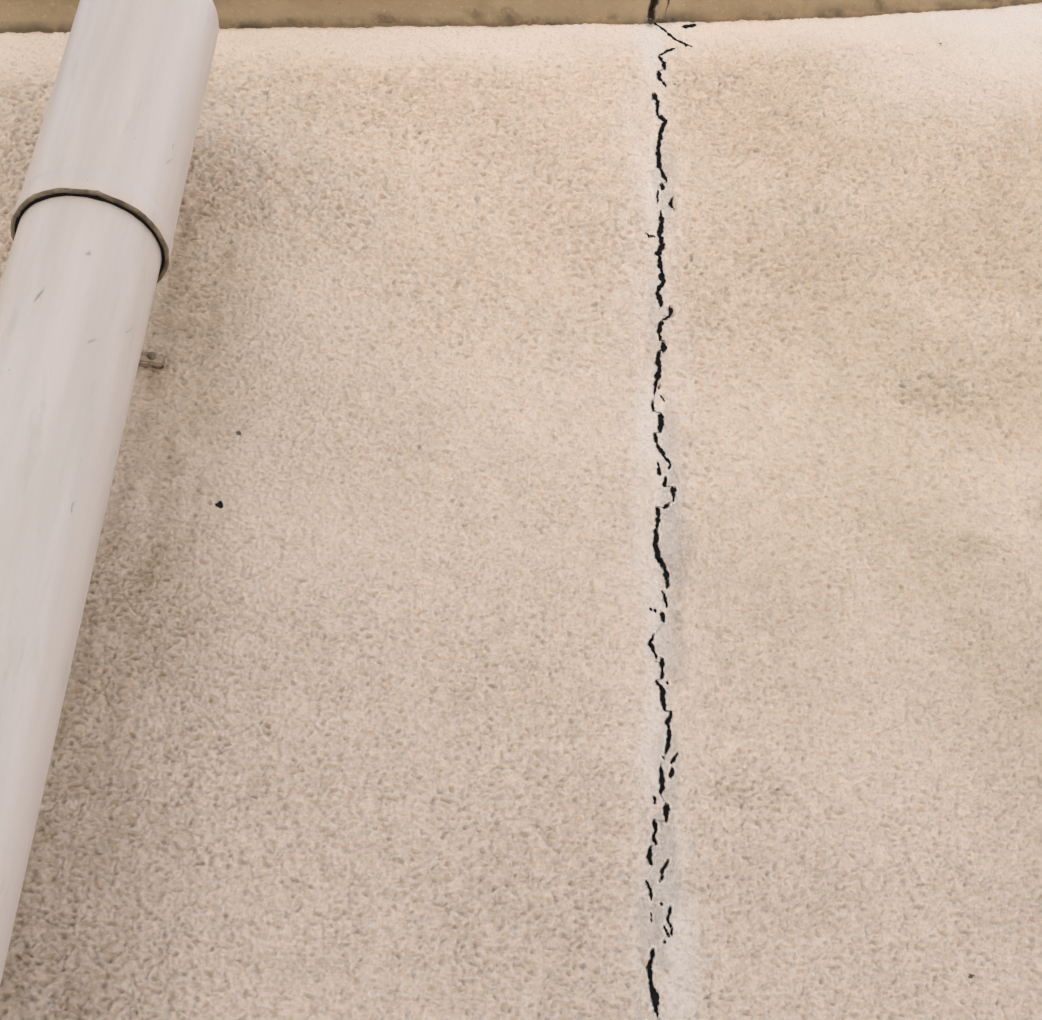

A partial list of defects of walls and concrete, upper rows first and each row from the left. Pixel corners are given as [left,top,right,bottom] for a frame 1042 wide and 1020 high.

crack [645,0,696,1020]